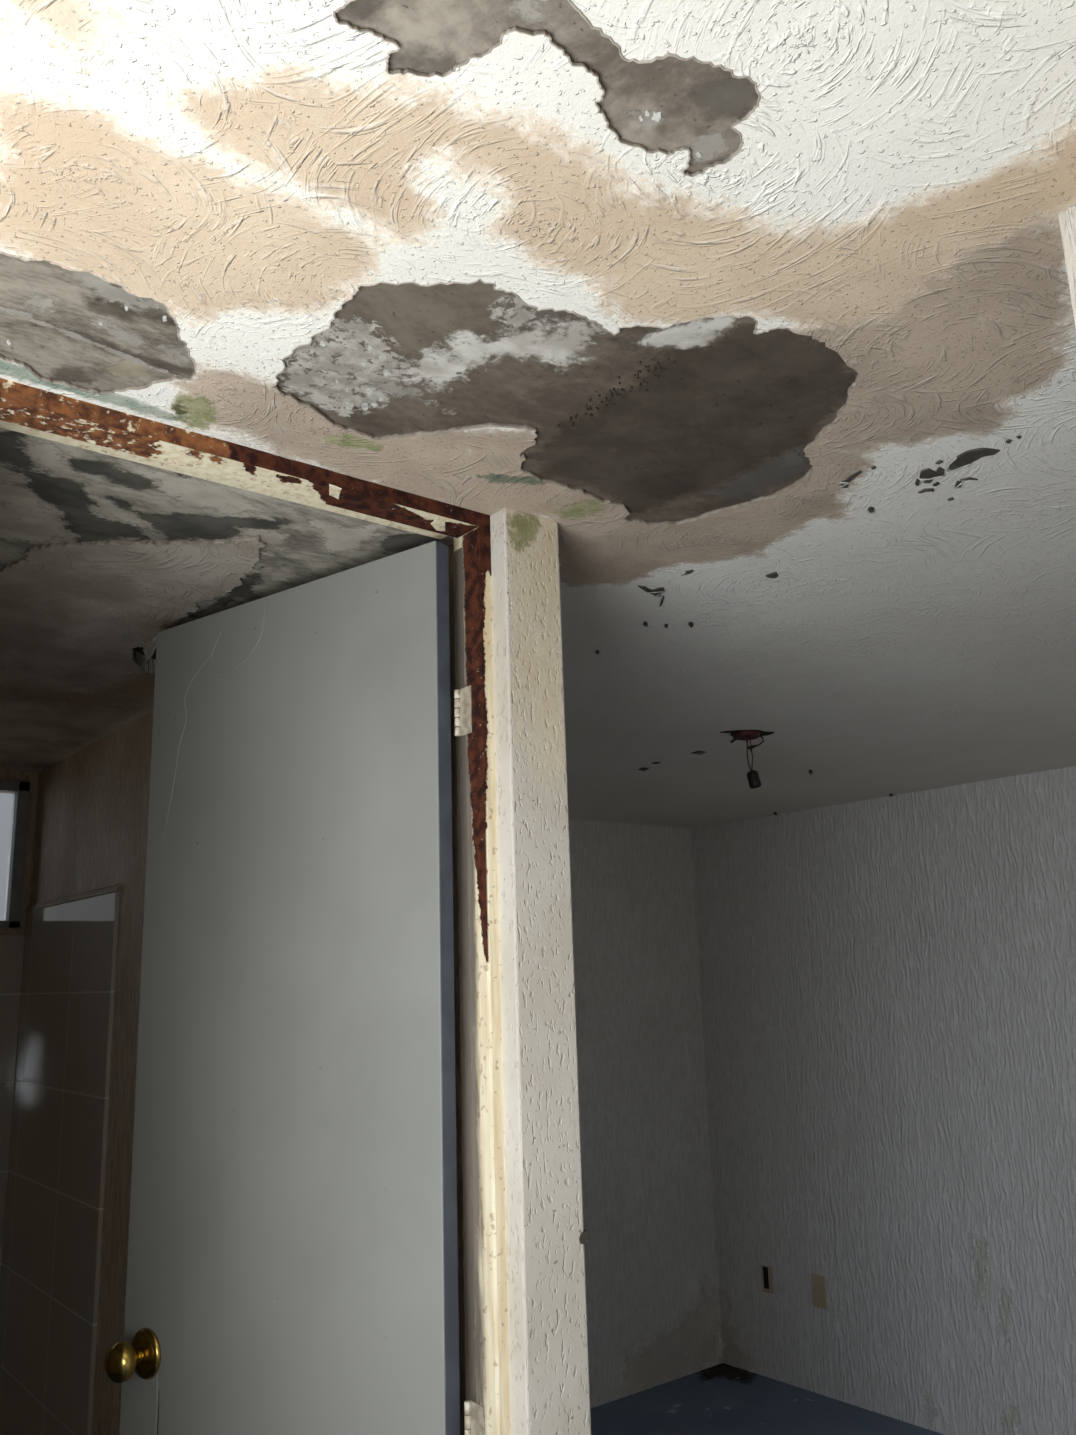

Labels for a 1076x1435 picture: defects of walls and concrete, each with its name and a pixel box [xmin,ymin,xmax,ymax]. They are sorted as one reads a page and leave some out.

damp [0,0,122,55]
flaking render [333,0,761,177]
flaking render [0,251,197,394]
flaking render [0,428,454,626]
damp [0,66,1076,768]
flaking render [273,279,860,526]
peeling [840,466,876,490]
peeling [915,435,1021,501]
corrosion [0,378,491,962]